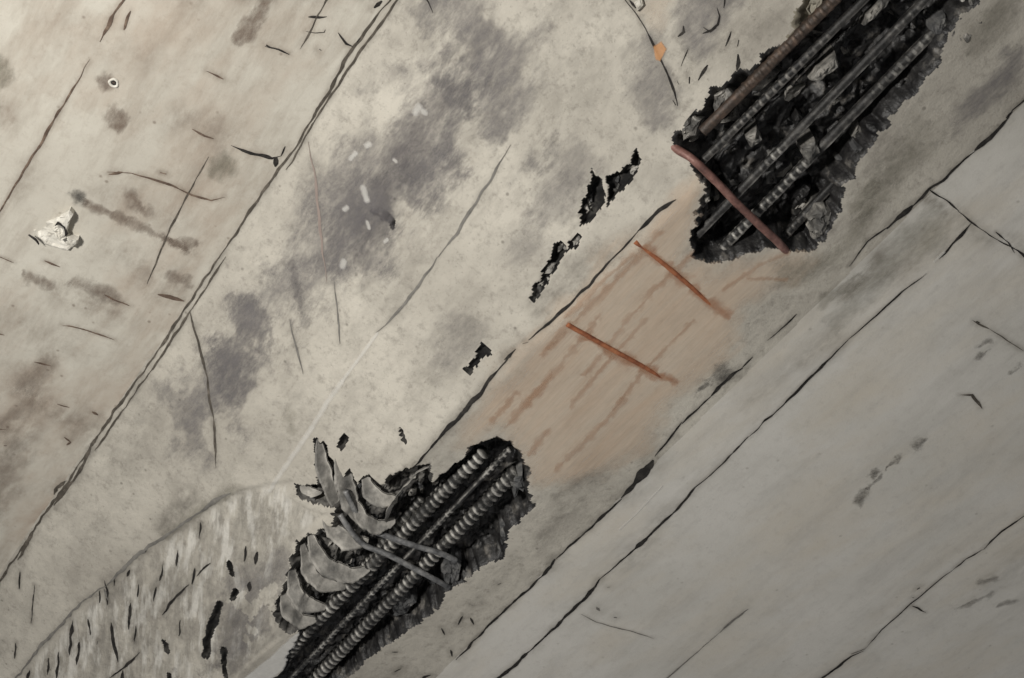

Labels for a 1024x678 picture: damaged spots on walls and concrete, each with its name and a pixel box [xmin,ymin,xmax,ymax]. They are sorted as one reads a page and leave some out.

crack [0,0,398,678]
water stain [286,138,452,287]
spalling [245,436,536,678]
crack [377,146,510,332]
crack [412,199,676,468]
spalling [529,148,642,303]
crack [441,315,796,658]
rust [486,199,766,476]
crack [625,0,678,106]
crack [497,100,1024,678]
spalling [671,0,981,264]